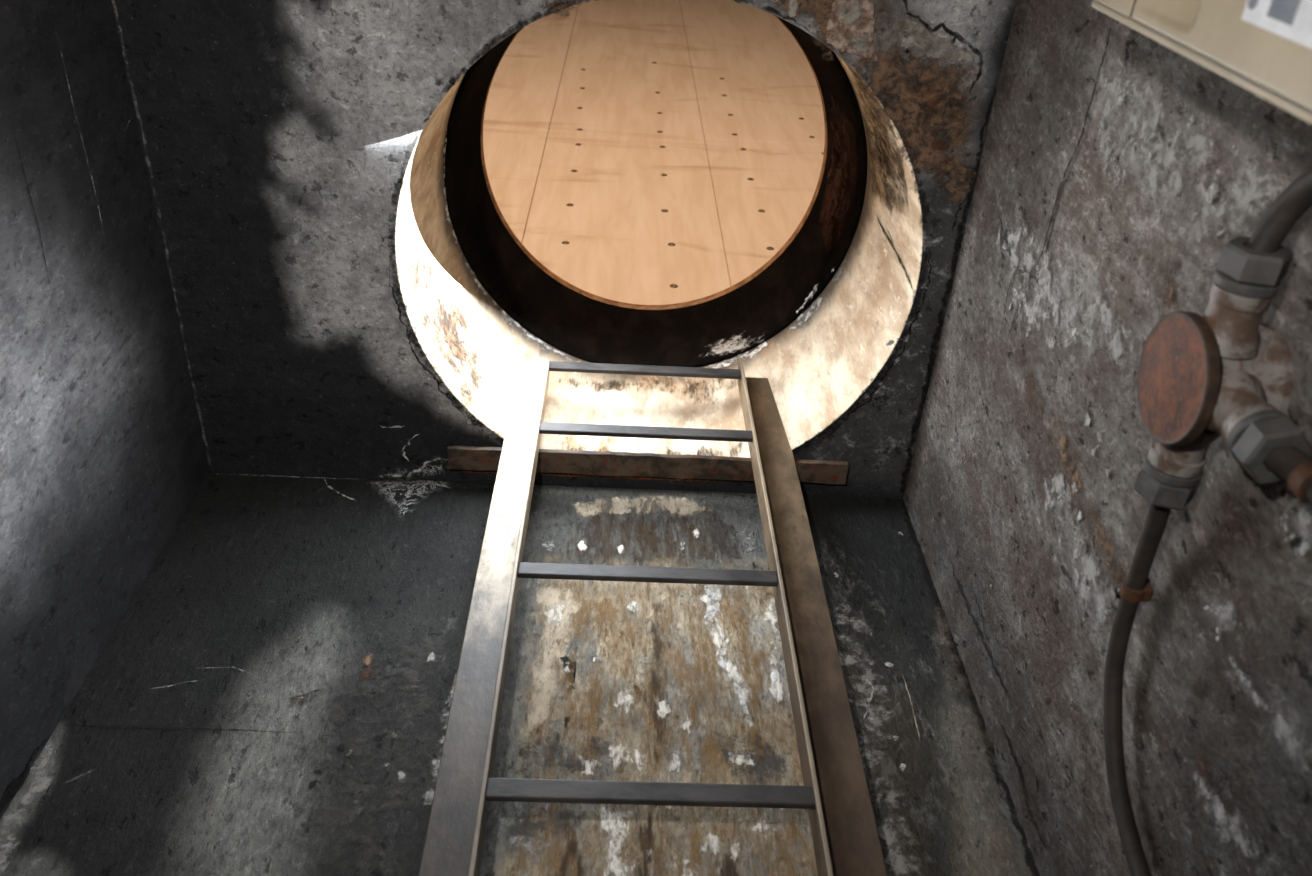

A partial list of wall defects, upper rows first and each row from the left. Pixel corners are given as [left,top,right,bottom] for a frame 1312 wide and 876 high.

rust [776,0,837,59]
crack [112,0,210,463]
rust [820,98,856,249]
crack [877,217,912,288]
rust [853,47,977,203]
crack [535,473,751,482]
crack [900,0,1111,876]